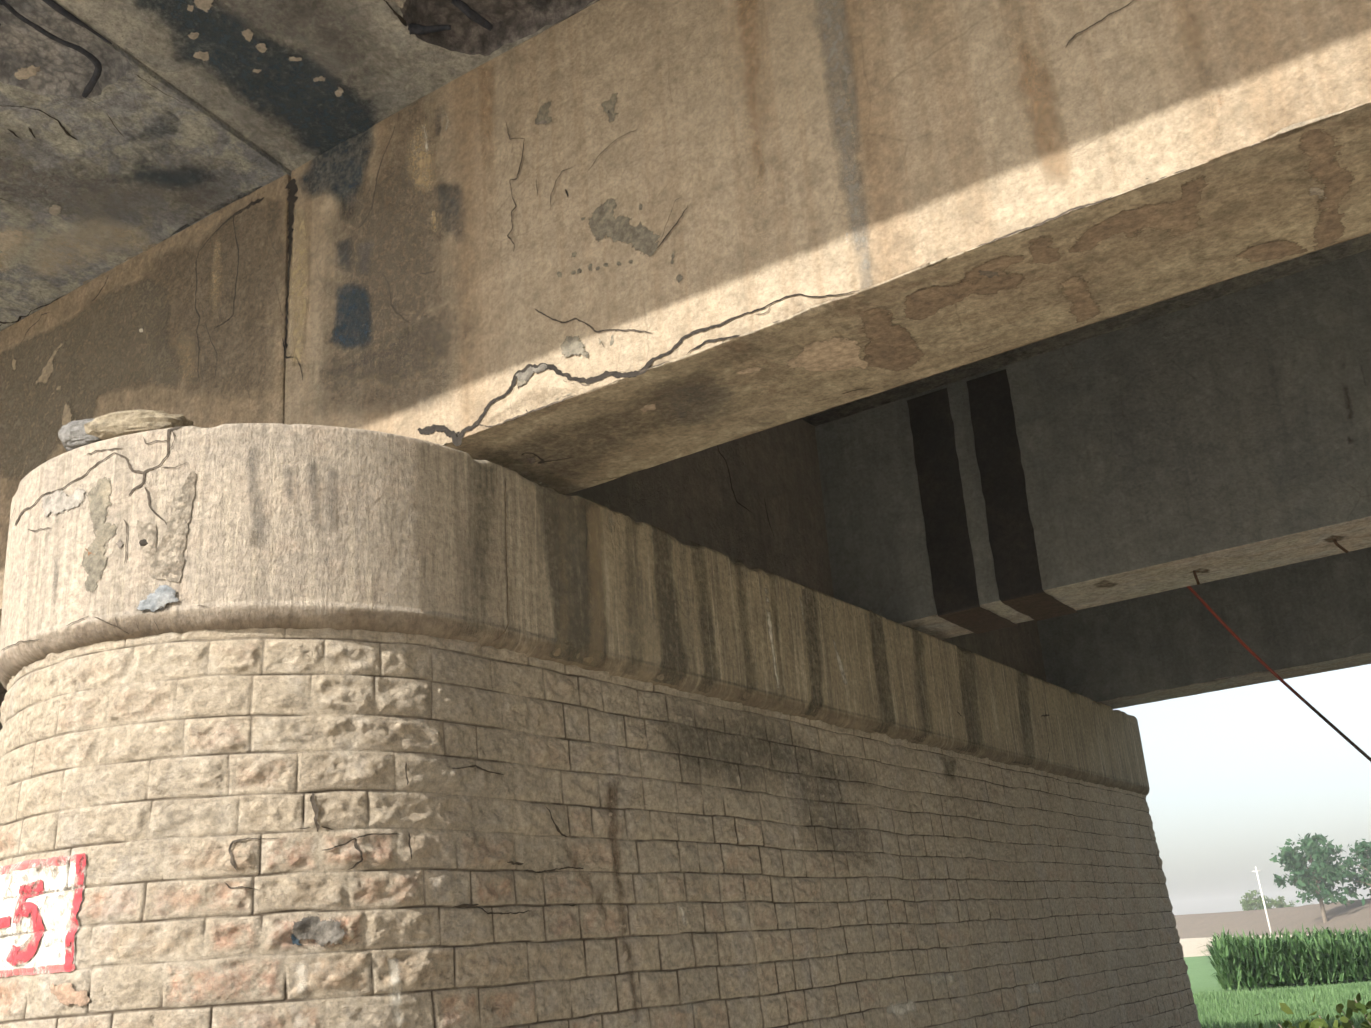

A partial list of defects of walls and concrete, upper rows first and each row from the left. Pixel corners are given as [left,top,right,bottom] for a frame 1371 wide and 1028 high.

spalling [392,0,596,56]
crack [195,197,303,382]
water stain [137,0,450,407]
peeling [557,198,683,283]
water stain [819,0,869,288]
crack [418,290,860,446]
crack [6,426,185,564]
crack [225,792,412,890]
spalling [289,915,345,947]